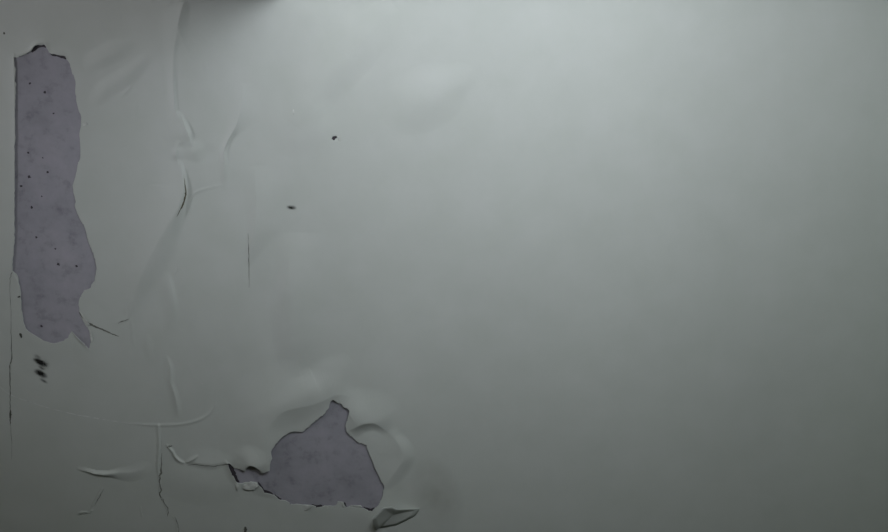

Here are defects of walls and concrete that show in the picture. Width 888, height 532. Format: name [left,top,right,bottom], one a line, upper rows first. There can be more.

peeling [0,21,119,370]
crack [6,336,14,459]
crack [159,445,179,532]
peeling [208,361,420,532]